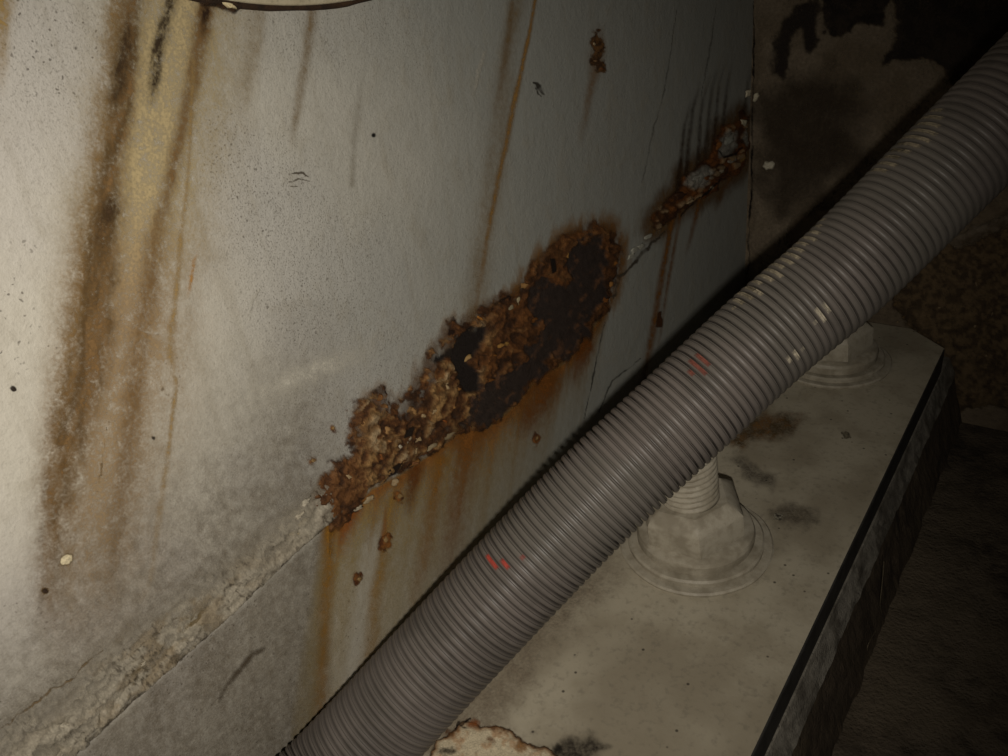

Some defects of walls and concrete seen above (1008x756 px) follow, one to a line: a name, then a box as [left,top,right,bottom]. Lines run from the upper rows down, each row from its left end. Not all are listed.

corrosion [589,29,606,82]
corrosion [486,0,536,240]
water stain [761,0,1008,213]
corrosion [643,89,752,377]
crack [2,650,103,728]
crack [87,693,142,742]
peeling [430,718,561,756]